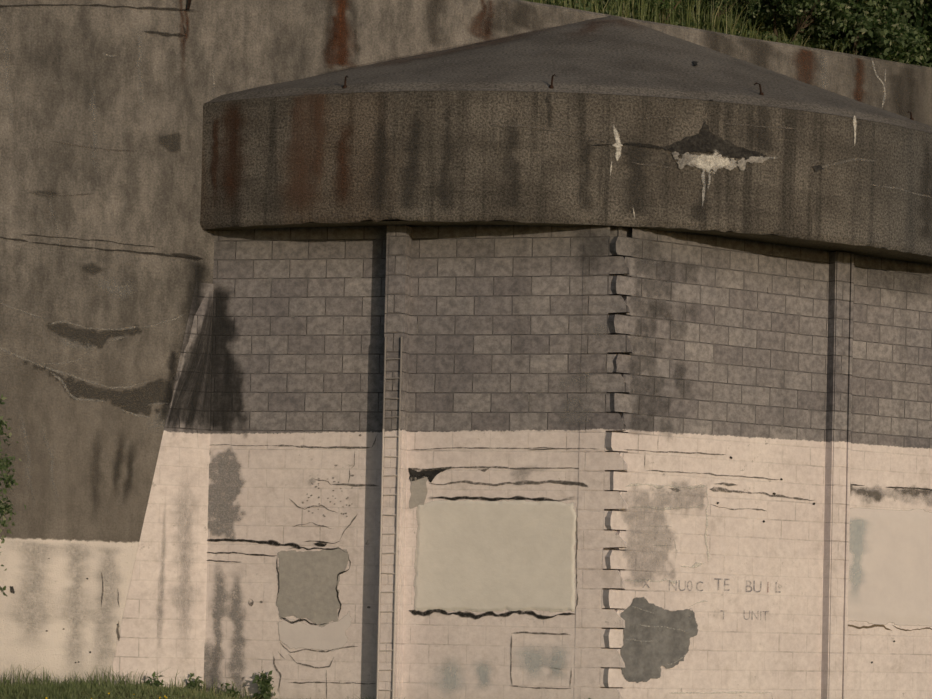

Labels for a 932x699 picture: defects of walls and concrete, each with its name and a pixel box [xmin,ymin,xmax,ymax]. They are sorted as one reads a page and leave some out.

crack [0,4,190,37]
spalling [662,122,775,206]
crack [0,234,203,260]
spalling [48,321,142,354]
spalling [17,355,173,424]
peeling [408,468,447,509]
peeling [625,482,815,568]
peeling [850,484,932,501]
spalling [276,477,358,668]
damp [204,574,244,690]
spalling [621,597,706,683]